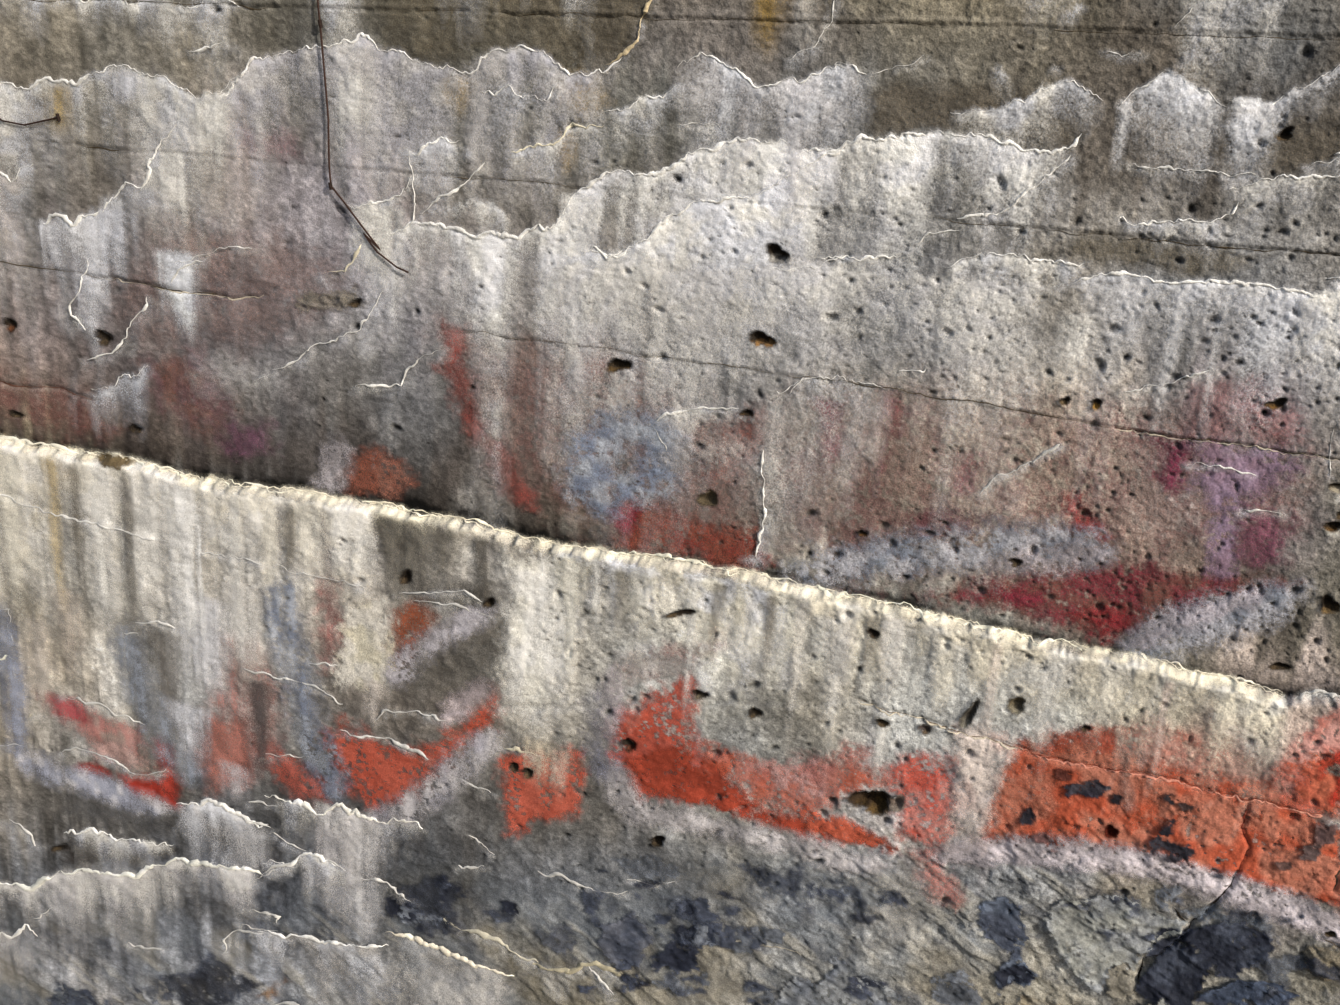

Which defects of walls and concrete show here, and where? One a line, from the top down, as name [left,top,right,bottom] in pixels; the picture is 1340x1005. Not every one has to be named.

crack [123,0,278,10]
crack [446,175,579,189]
water stain [0,0,1340,466]
crack [937,217,1340,256]
crack [0,261,264,301]
crack [460,331,1337,461]
water stain [0,435,1340,823]
spalling [847,790,905,816]
water stain [0,766,514,1005]
water stain [538,871,675,895]
water stain [854,875,928,942]
water stain [443,918,623,998]